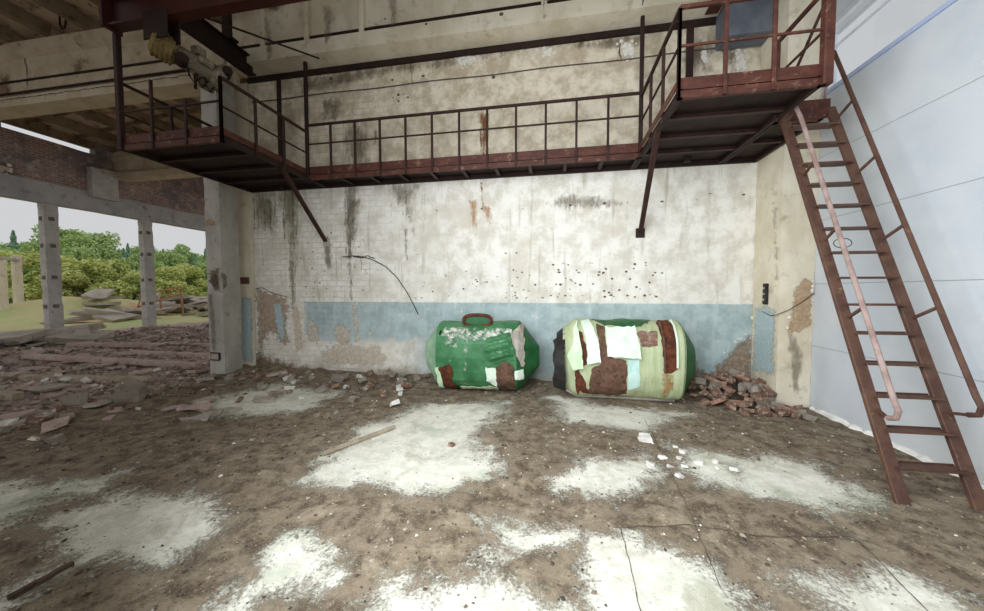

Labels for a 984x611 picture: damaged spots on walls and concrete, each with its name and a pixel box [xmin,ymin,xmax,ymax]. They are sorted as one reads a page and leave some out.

damp [254,191,298,245]
damp [347,187,358,258]
peeling [241,287,386,369]
peeling [710,279,815,388]
crack [620,419,928,611]